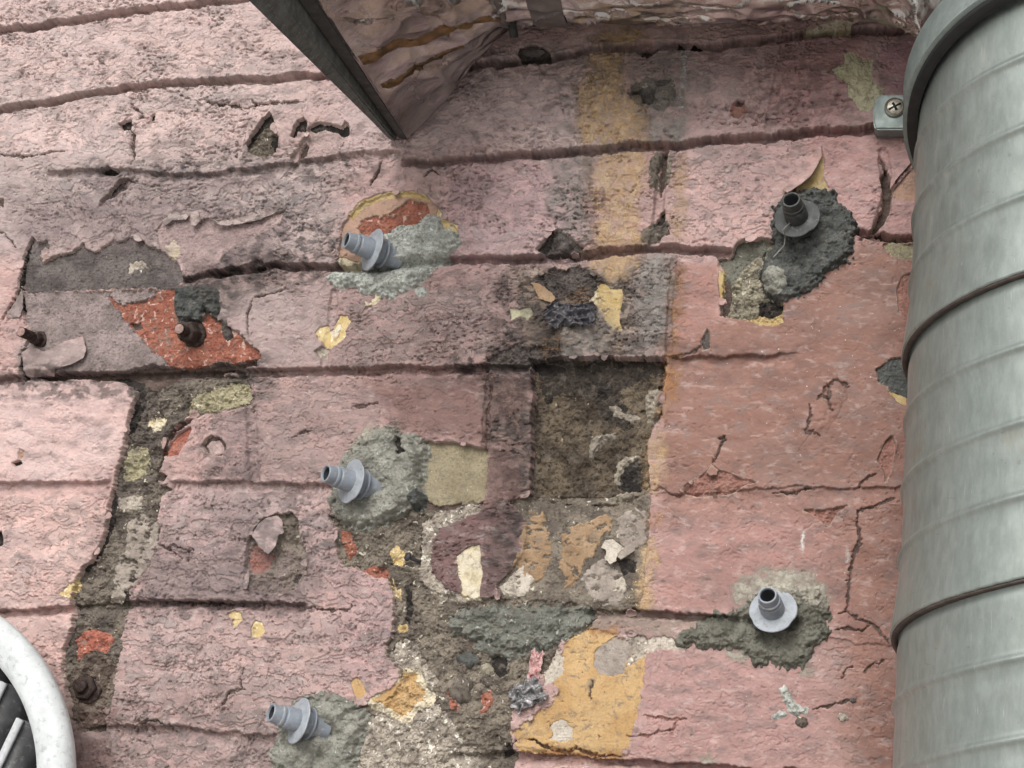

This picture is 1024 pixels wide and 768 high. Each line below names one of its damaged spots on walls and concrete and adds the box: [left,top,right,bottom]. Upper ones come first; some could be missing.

peeling [241,115,279,158]
peeling [292,121,350,163]
peeling [337,190,459,272]
crack [861,159,904,244]
peeling [510,271,556,320]
peeling [589,284,623,334]
flaking render [718,236,784,326]
flaking render [876,358,908,405]
peeling [6,207,285,732]
spalling [330,353,685,768]
crack [815,474,895,710]